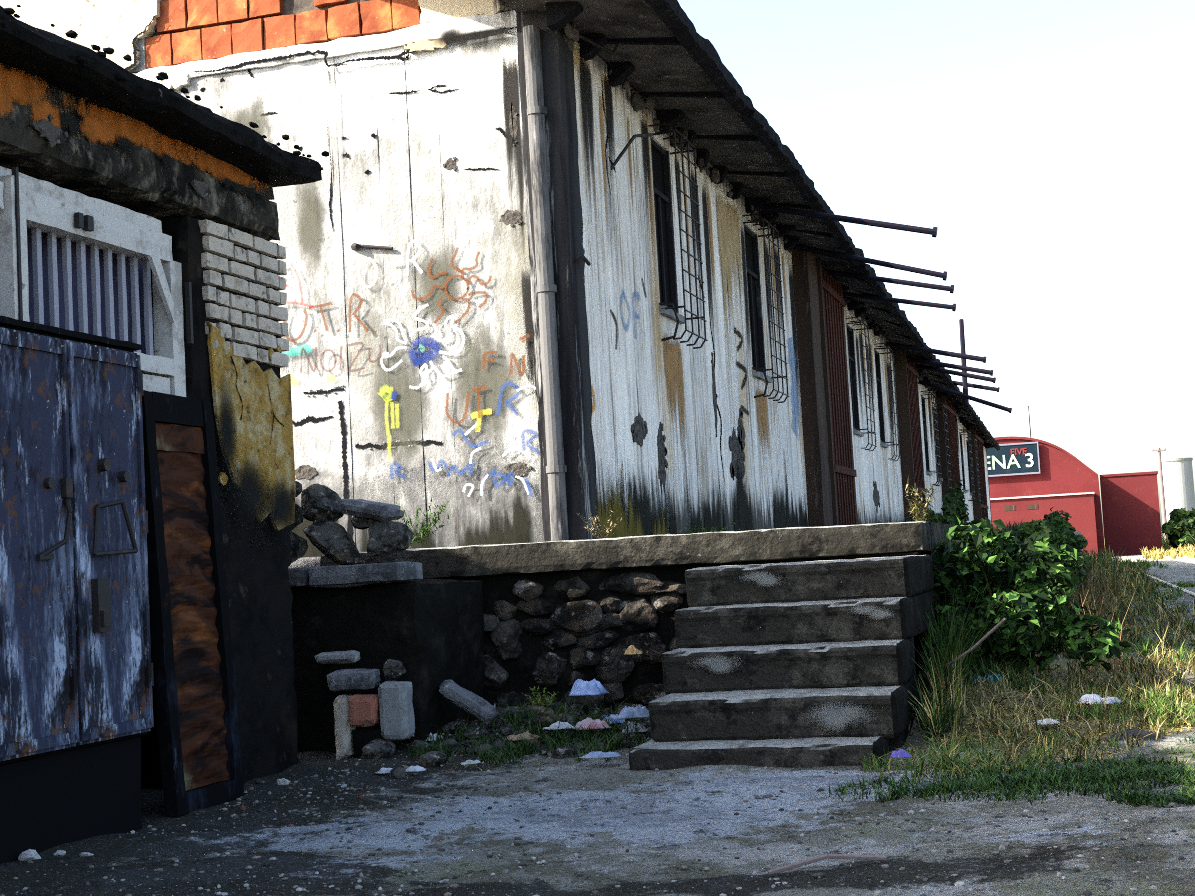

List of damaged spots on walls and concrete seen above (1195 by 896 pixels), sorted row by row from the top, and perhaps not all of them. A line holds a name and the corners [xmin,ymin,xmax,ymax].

corrosion [0,64,259,191]
water stain [234,105,265,135]
water stain [297,183,322,266]
flaking render [206,321,318,531]
water stain [596,462,754,538]
water stain [773,453,808,529]